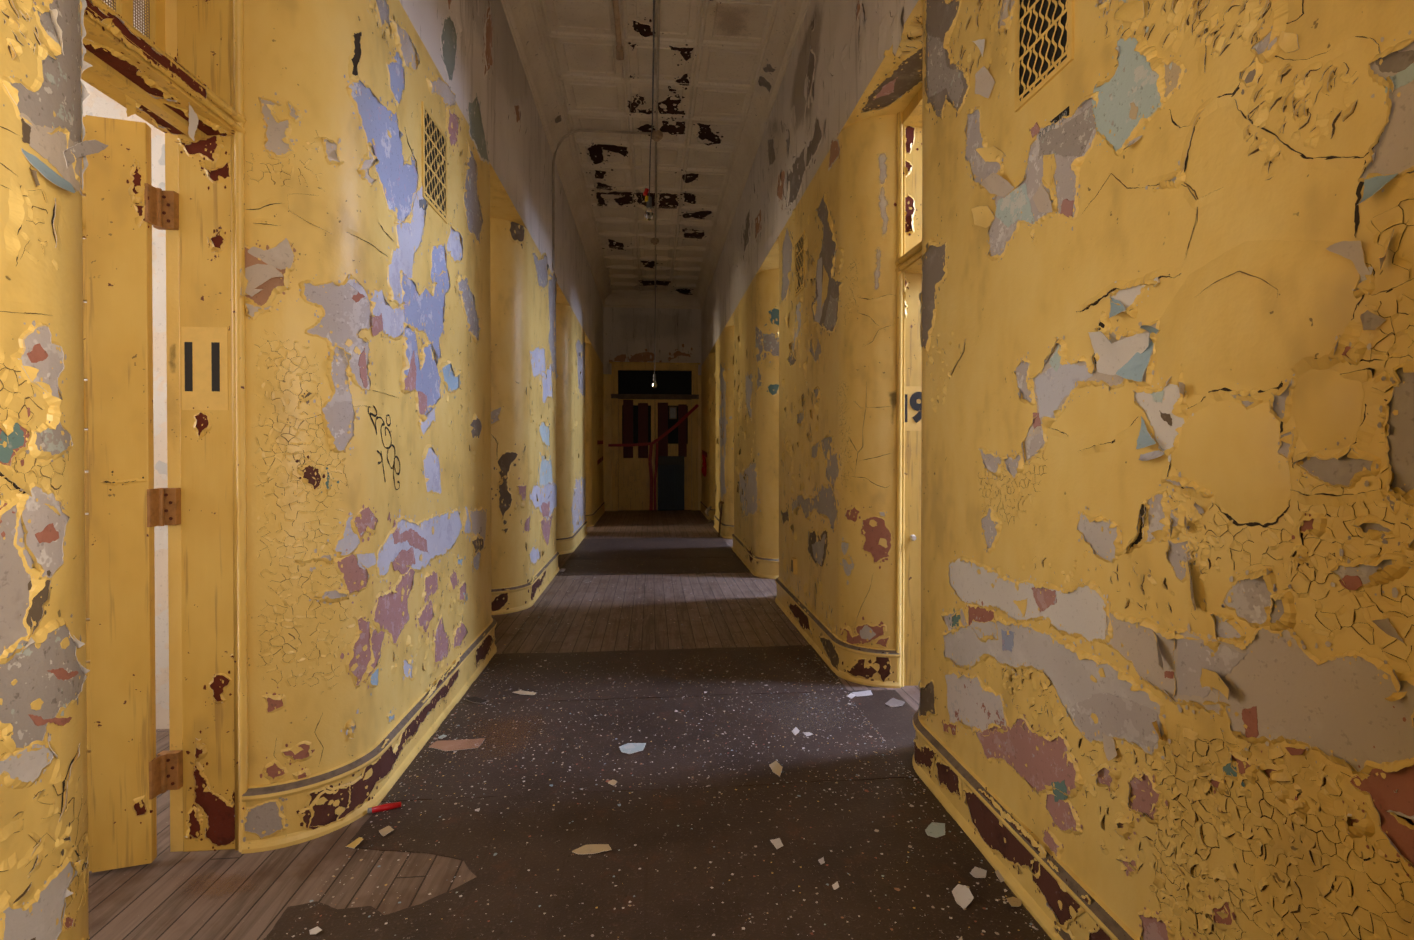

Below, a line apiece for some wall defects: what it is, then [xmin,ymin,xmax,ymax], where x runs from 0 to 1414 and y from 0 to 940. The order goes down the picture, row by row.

peeling [0,0,234,195]
peeling [627,17,723,148]
peeling [857,0,1414,261]
peeling [0,320,73,469]
peeling [181,0,592,851]
peeling [714,118,844,522]
peeling [894,195,949,352]
crack [1076,0,1414,668]
peeling [1326,229,1394,366]
peeling [0,482,90,940]
peeling [781,274,1414,940]
crack [1148,726,1414,940]